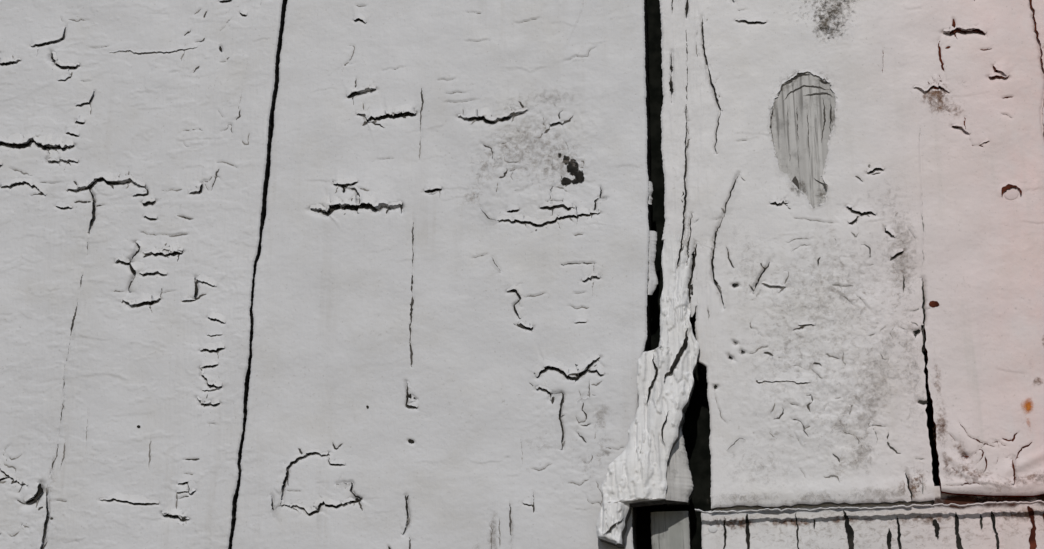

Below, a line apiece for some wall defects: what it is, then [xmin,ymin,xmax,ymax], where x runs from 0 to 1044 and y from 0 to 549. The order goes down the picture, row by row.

crack [66,91,95,136]
crack [478,111,607,236]
peeling [766,69,840,211]
crack [407,215,415,367]
crack [474,255,543,330]
crack [680,173,929,360]
crack [0,242,88,549]
crack [100,492,188,525]
crack [490,444,547,549]
crack [563,381,623,505]
crack [729,322,924,502]
crack [951,422,1032,486]